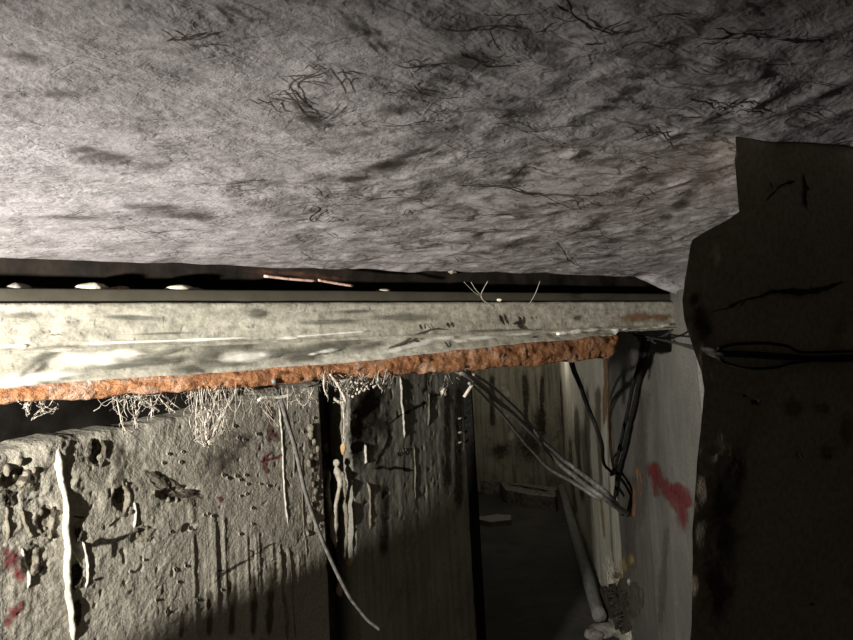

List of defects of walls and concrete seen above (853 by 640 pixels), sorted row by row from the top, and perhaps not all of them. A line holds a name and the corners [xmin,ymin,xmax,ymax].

crack [161,29,208,47]
crack [248,0,849,162]
crack [280,98,765,275]
crack [714,281,848,312]
spalling [0,458,38,507]
spalling [36,506,57,539]
spalling [87,438,108,468]
spalling [113,478,133,517]
water stain [325,466,349,560]
water stain [347,385,389,467]
water stain [443,385,463,507]
spalling [71,563,83,626]